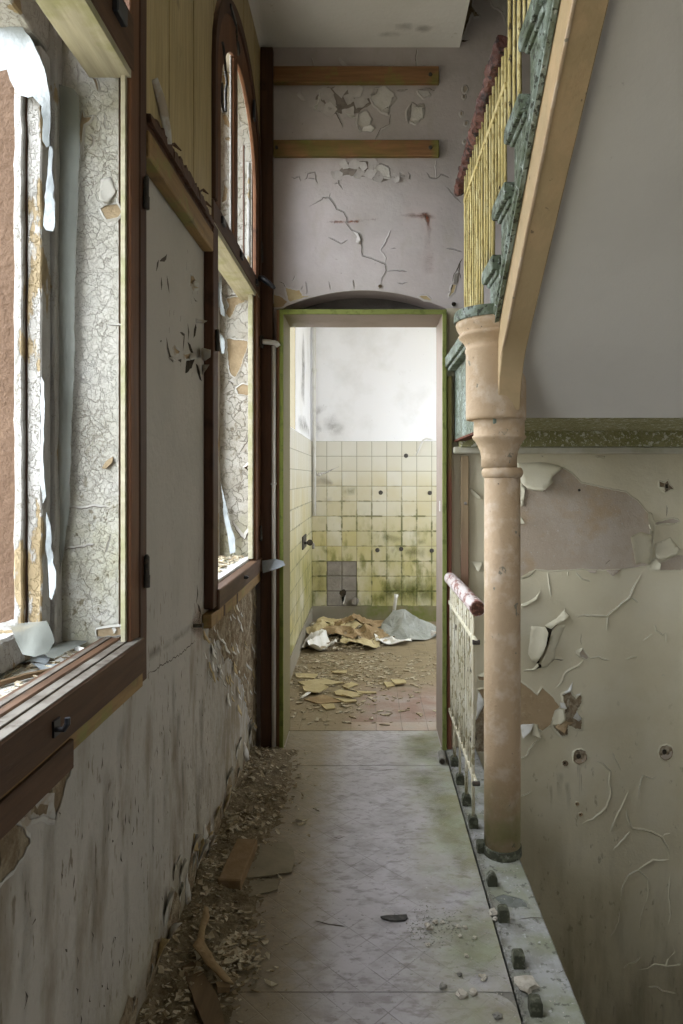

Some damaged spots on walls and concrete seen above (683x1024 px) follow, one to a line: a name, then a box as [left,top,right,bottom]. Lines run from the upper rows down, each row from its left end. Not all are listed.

peeling [309,85,435,132]
peeling [331,158,405,183]
crack [292,171,407,284]
peeling [160,310,211,381]
peeling [225,337,248,397]
crack [69,502,108,510]
crack [64,534,111,553]
peeling [517,462,683,739]
spalling [0,763,75,888]
spalling [119,586,257,1024]